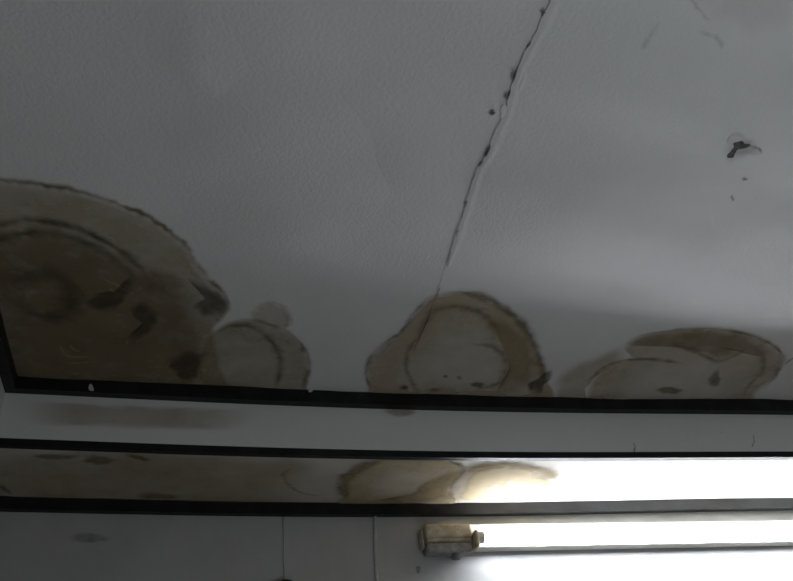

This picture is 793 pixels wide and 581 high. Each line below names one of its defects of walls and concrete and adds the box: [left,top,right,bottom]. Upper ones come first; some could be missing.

leakage [0,181,310,387]
leakage [367,293,552,397]
leakage [339,460,556,504]